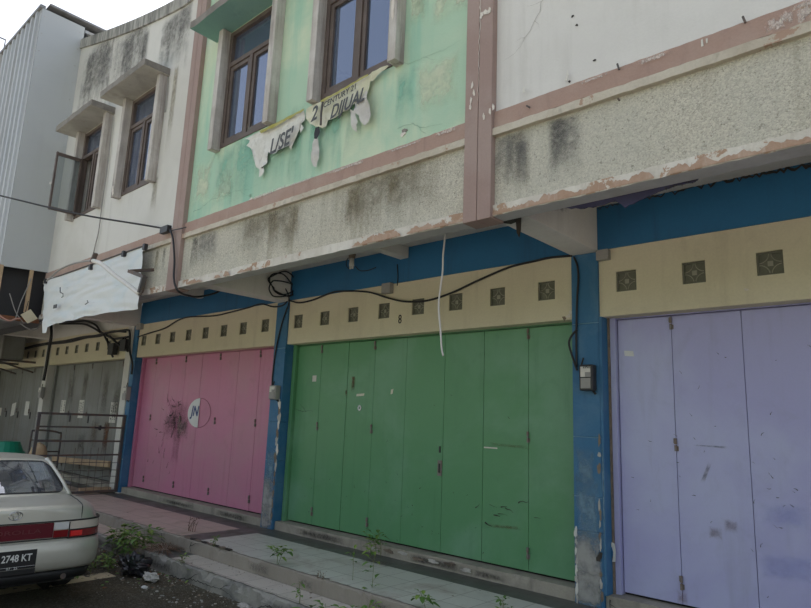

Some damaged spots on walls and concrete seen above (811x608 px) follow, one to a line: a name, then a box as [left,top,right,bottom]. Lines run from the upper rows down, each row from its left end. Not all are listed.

water stain [122,28,147,72]
water stain [163,16,184,54]
peeling [667,136,811,175]
peeling [492,171,654,237]
peeling [352,218,463,247]
peeling [261,399,281,527]
peeling [574,434,616,605]